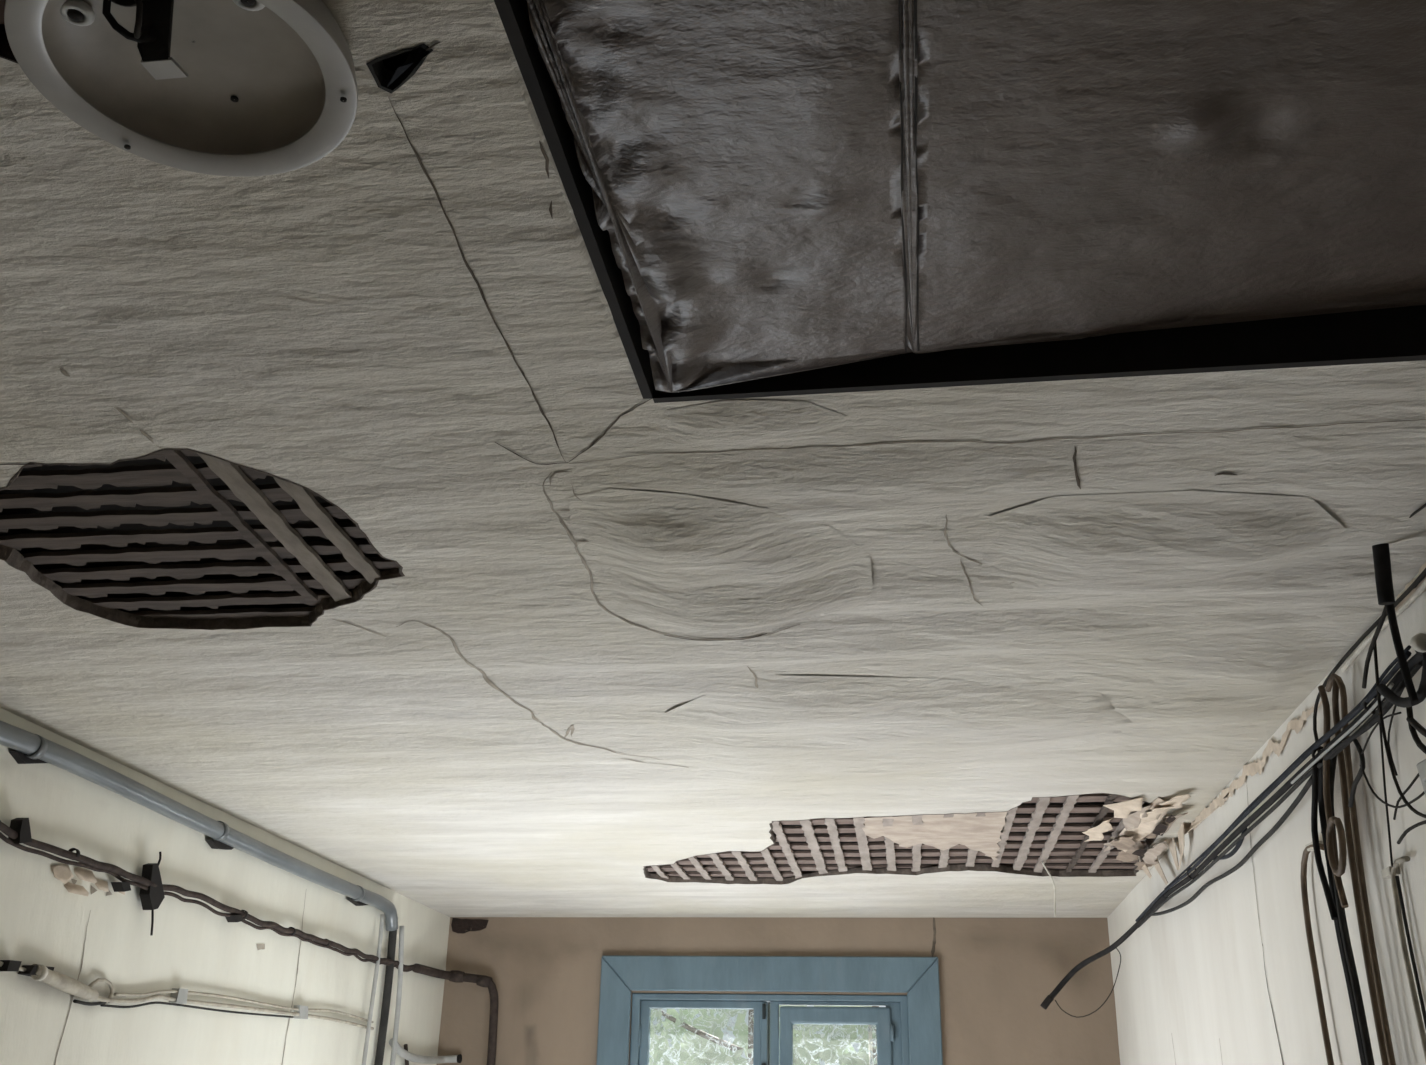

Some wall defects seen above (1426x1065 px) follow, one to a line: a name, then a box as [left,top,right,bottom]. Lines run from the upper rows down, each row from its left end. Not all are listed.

flaking render [0,0,18,64]
crack [389,98,1426,688]
flaking render [0,448,405,630]
crack [332,619,689,768]
flaking render [643,792,1229,917]